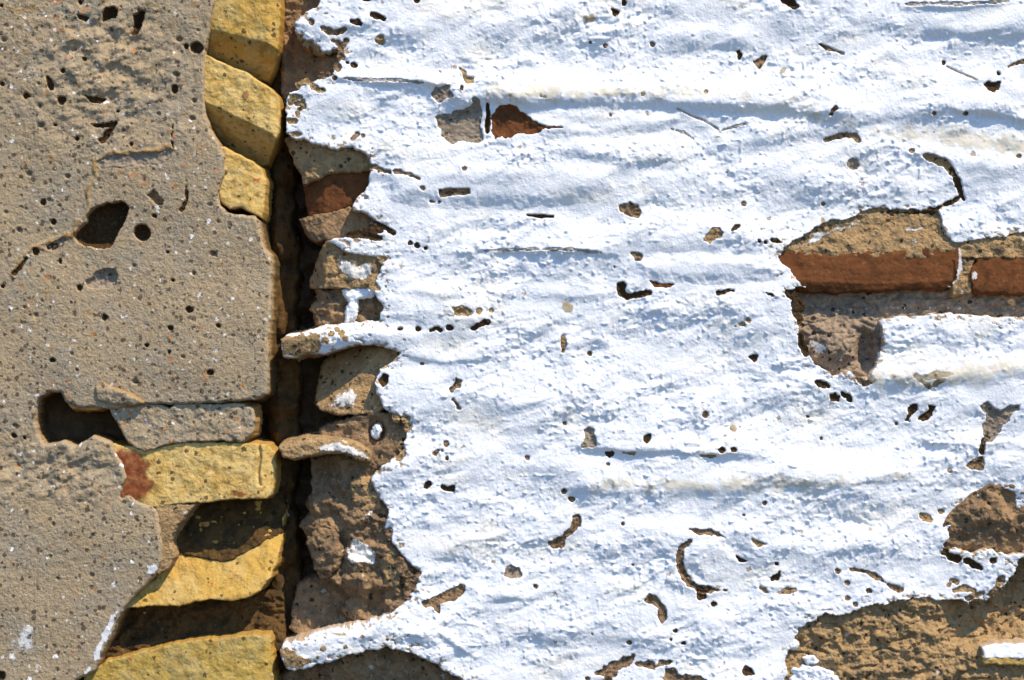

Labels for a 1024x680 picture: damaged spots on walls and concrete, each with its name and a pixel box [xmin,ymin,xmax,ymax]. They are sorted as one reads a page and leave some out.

peeling [431,67,563,144]
spalling [45,0,462,680]
spalling [757,204,1024,402]
peeling [966,402,1019,471]
crack [676,528,728,601]
spalling [784,483,1024,680]
spalling [585,640,707,680]